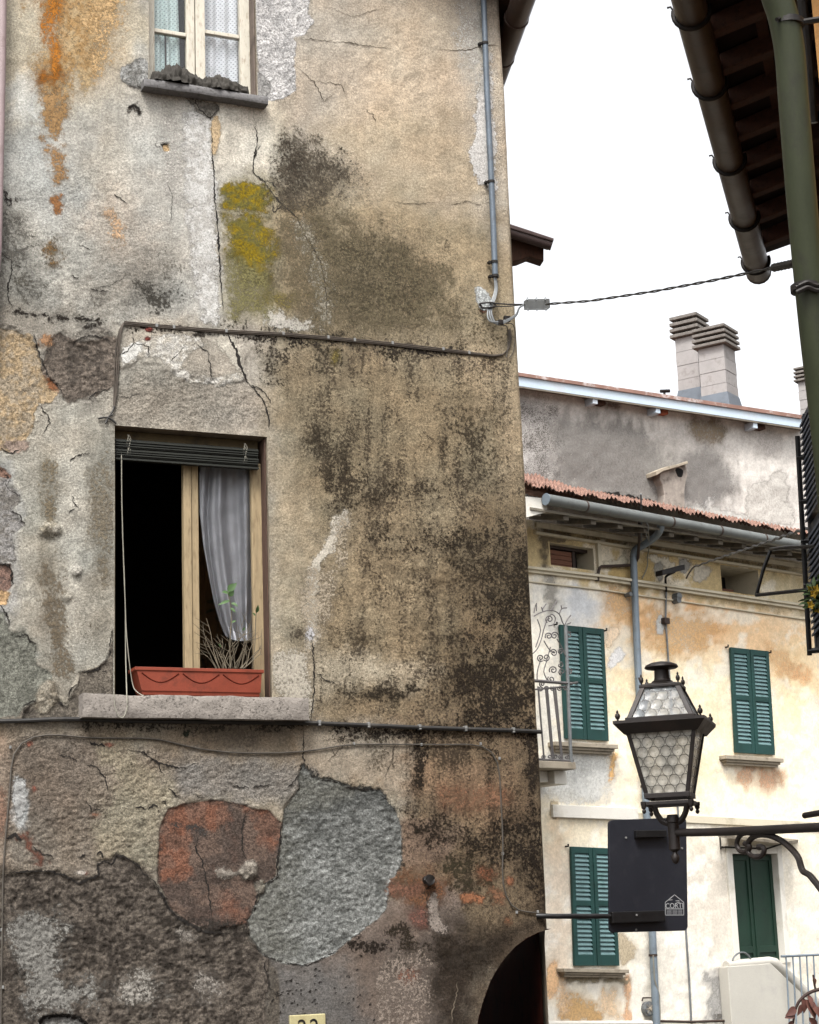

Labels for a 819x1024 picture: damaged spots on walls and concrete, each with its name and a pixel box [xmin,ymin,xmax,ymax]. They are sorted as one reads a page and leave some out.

corrosion [30,0,128,215]
crack [77,99,271,427]
spalling [256,0,314,101]
crack [252,111,328,312]
leakage [37,459,59,523]
flaking render [0,327,244,453]
leakage [75,111,789,753]
flaking render [0,800,282,1024]